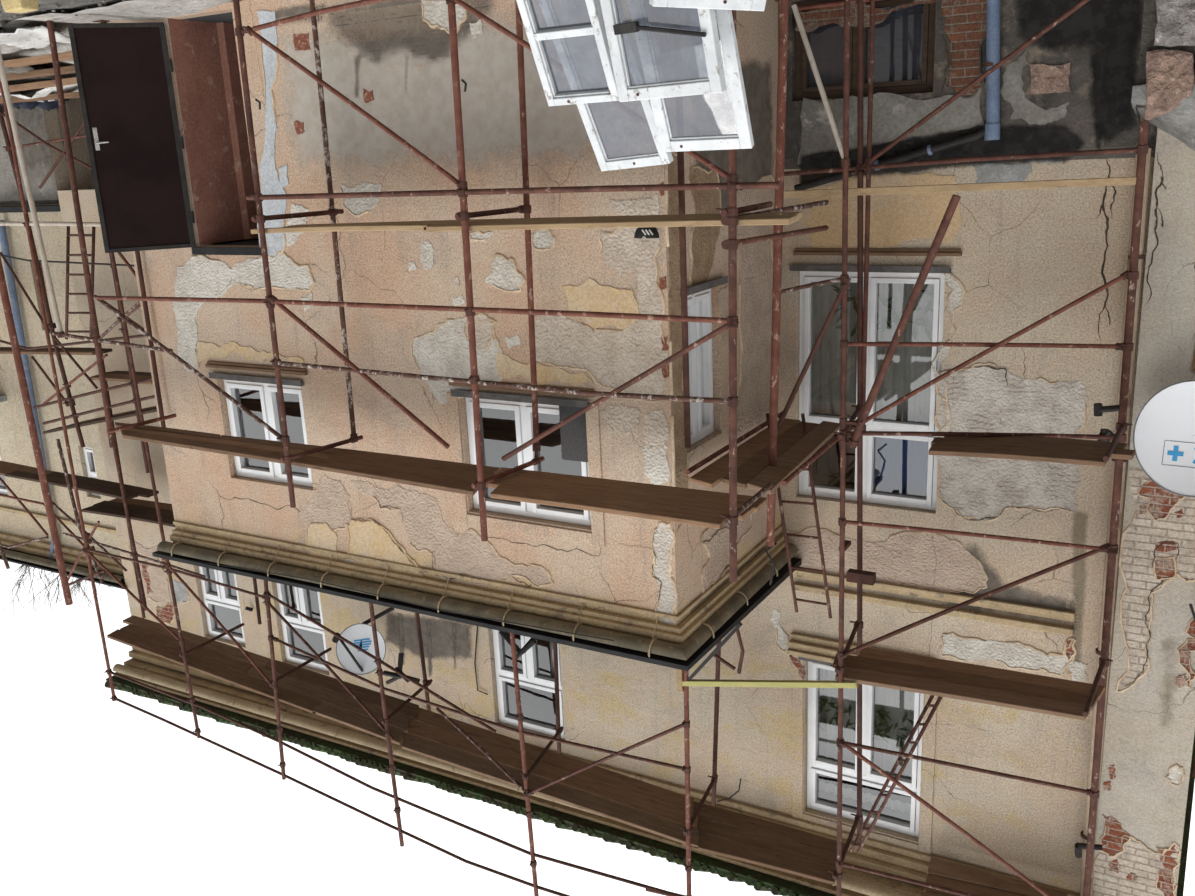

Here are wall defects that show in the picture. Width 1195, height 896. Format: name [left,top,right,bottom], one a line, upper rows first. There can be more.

flaking render [793,0,987,99]
peeling [243,204,316,314]
crack [1096,158,1117,344]
crack [1145,154,1167,306]
spalling [411,294,521,382]
crack [211,484,300,529]
crack [336,496,471,579]
crack [488,537,601,556]
flaking render [1115,480,1195,693]
peeling [940,632,1088,682]
flaking render [1103,765,1116,791]
flaking render [1093,814,1181,896]